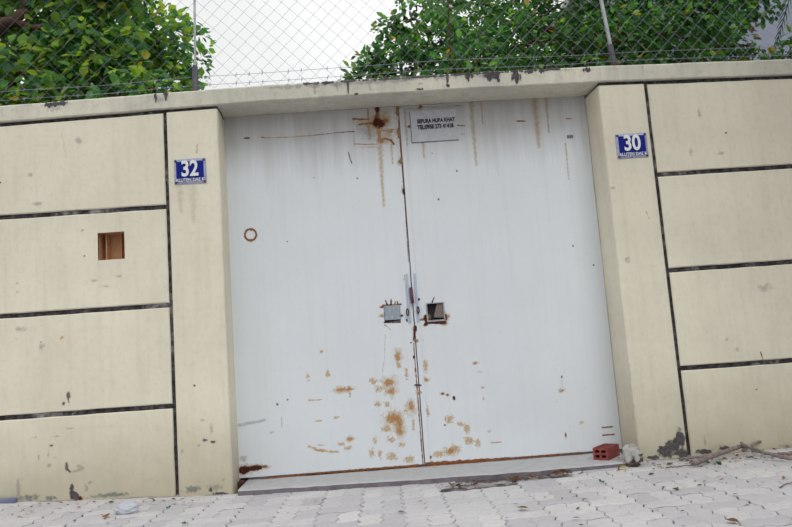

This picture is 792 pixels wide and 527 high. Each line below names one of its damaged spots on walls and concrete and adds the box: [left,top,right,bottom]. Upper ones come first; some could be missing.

corrosion [276,107,410,262]
corrosion [239,300,583,479]
flaking render [647,432,688,460]